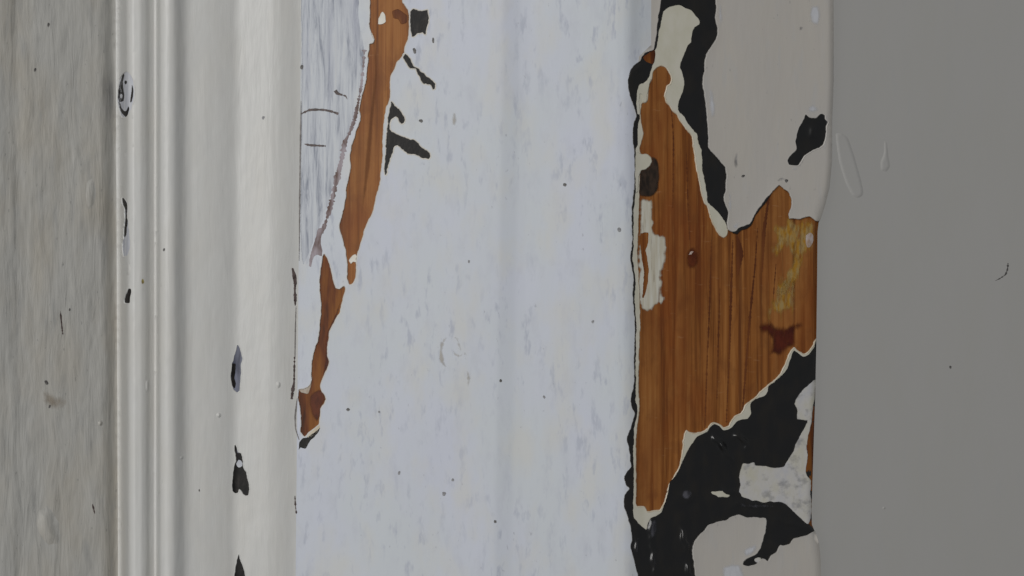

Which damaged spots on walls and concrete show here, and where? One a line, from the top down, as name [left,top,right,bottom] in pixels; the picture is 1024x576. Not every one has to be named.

peeling [117,71,136,119]
peeling [787,113,829,167]
peeling [297,0,436,449]
peeling [624,0,819,576]
peeling [230,344,244,394]
peeling [231,444,250,497]